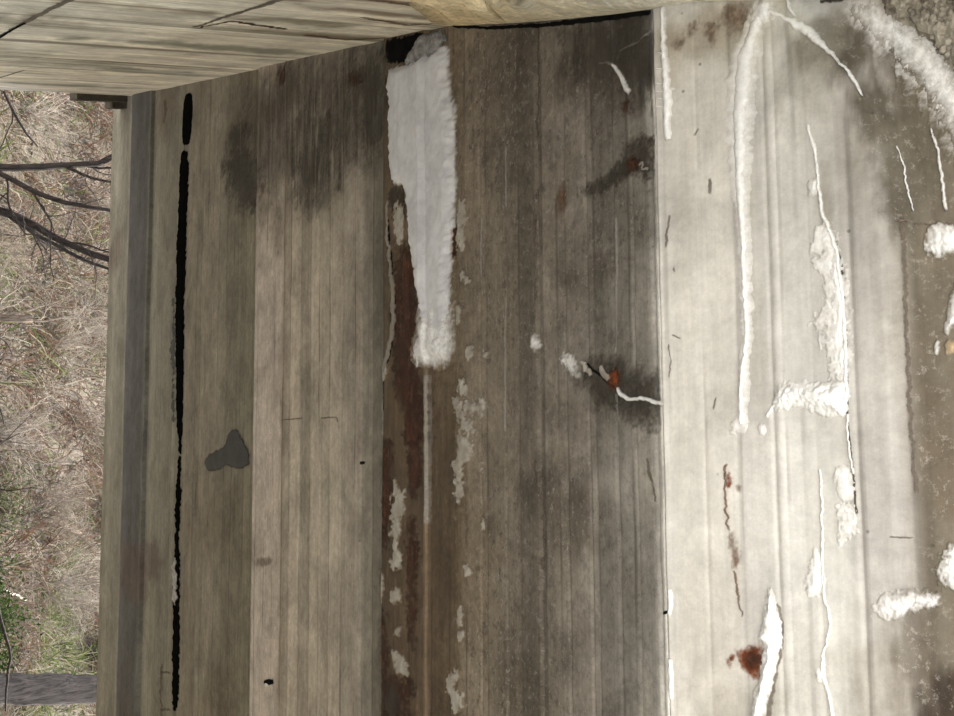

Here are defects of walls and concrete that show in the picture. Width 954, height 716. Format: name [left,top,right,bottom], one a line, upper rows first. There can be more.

water stain [839,0,954,169]
water stain [221,29,459,525]
rust [585,135,655,195]
water stain [722,0,851,436]
water stain [923,220,954,259]
rust [381,246,456,716]
water stain [871,538,954,622]
rust [727,646,762,678]
water stain [750,588,784,716]